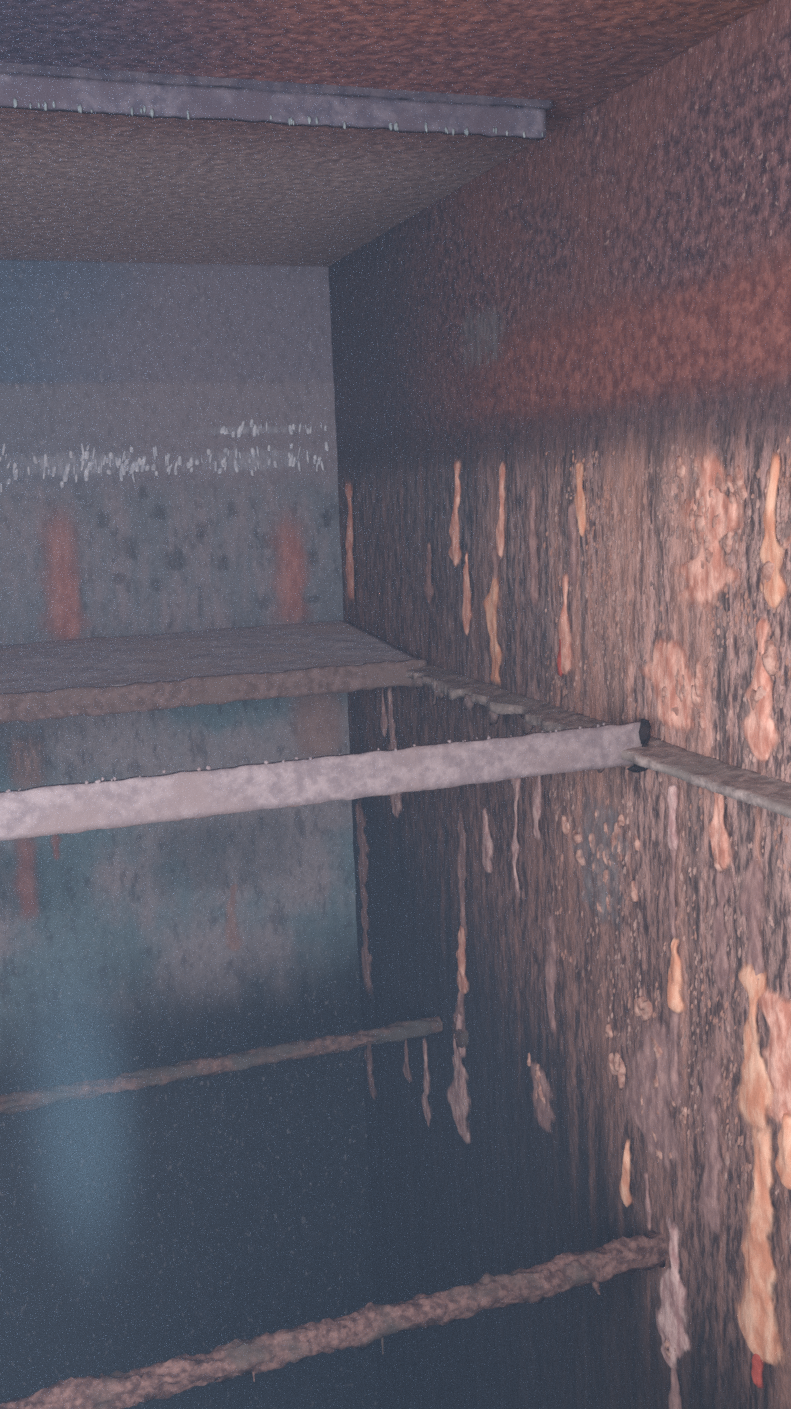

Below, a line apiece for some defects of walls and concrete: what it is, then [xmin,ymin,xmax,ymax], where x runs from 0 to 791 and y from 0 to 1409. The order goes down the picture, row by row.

rust [345,482,354,599]
rust [449,461,505,684]
rust [556,462,586,676]
rust [743,454,786,762]
rust [403,1038,431,1127]
rust [447,808,493,1143]
rust [511,776,542,901]
rust [545,914,557,1035]
rust [667,784,684,1100]
rust [700,1056,722,1233]
rust [707,792,791,1388]
rust [619,1140,690,1409]